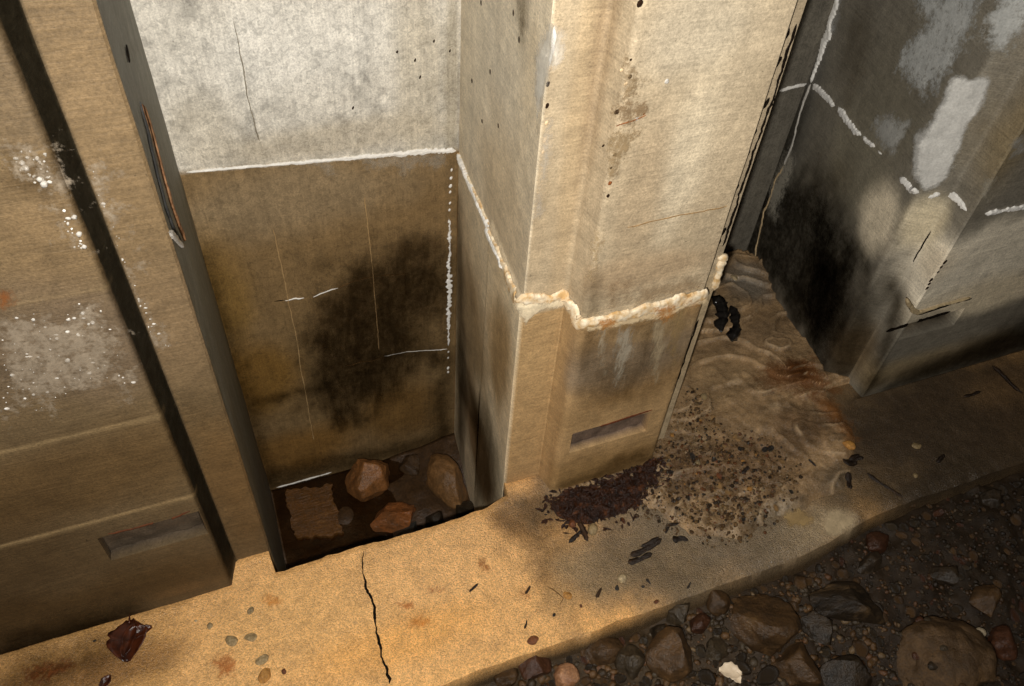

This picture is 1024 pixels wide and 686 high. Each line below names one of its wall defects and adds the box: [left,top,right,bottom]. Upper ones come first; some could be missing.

water stain [13,151,52,188]
water stain [62,209,87,249]
rust [139,101,186,248]
water stain [188,147,728,423]
water stain [747,187,863,365]
water stain [2,303,136,410]
crack [362,551,391,684]